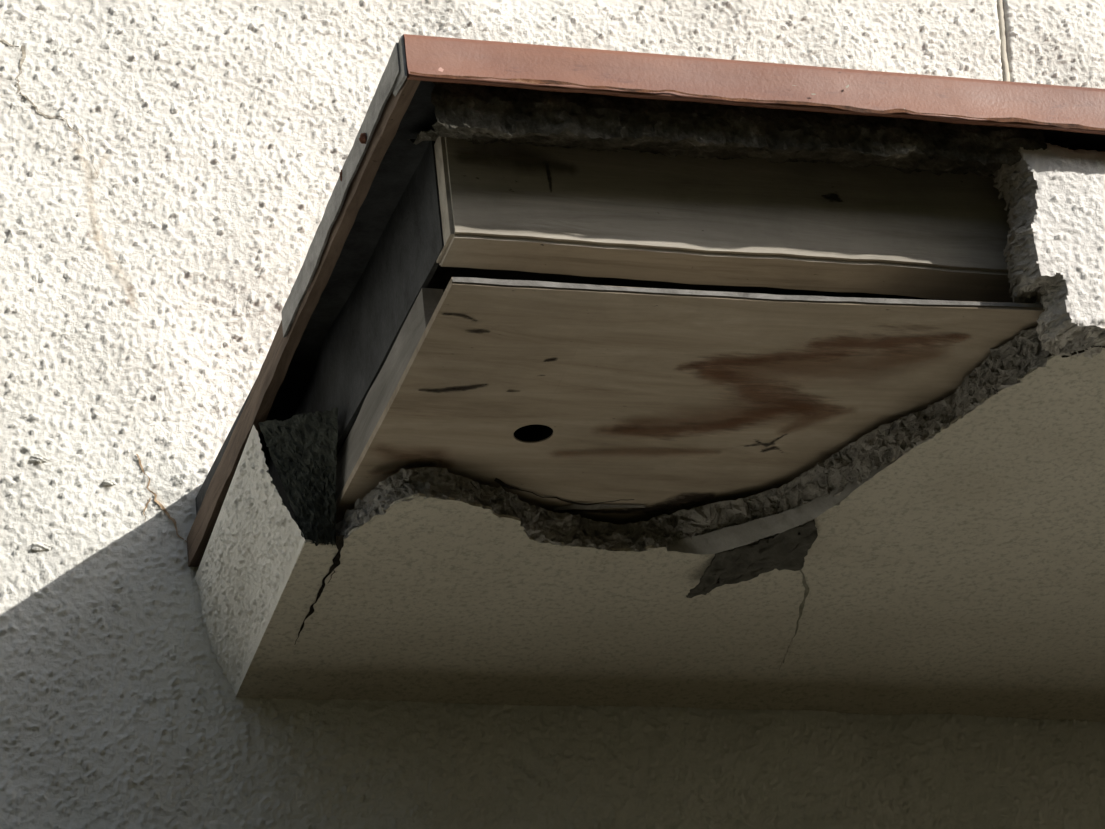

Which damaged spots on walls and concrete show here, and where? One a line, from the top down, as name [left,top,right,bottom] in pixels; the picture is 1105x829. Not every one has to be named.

crack [0,39,98,178]
flaking render [258,148,1105,663]
damp [613,334,968,452]
crack [294,535,344,645]